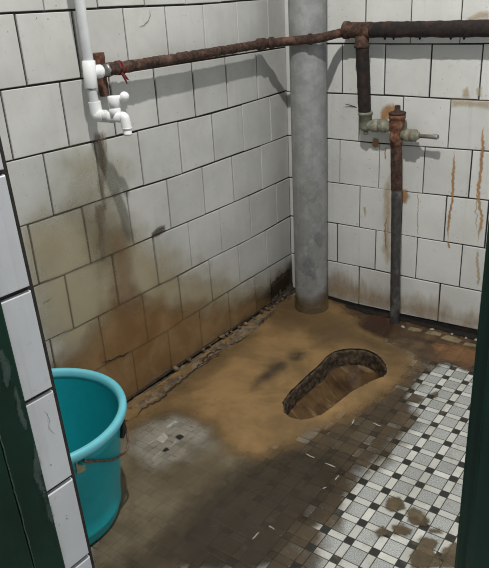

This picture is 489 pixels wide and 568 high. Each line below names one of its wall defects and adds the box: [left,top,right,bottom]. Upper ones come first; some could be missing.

water stain [30,134,293,401]
spalling [127,254,295,409]
rust [447,159,455,231]
rust [475,130,484,235]